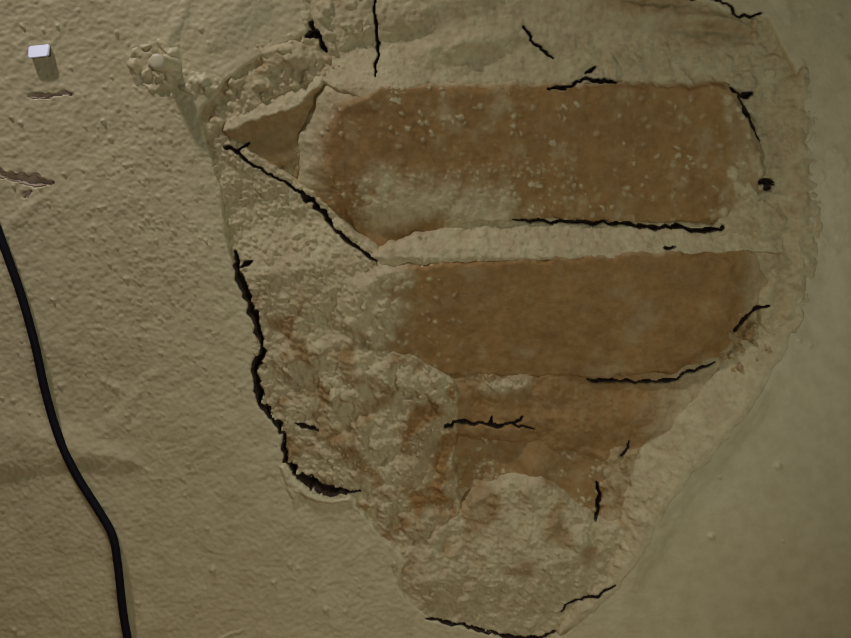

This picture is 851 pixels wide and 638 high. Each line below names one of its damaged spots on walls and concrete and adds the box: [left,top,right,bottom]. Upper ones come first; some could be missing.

crack [714,0,761,19]
crack [372,0,380,77]
crack [522,25,553,59]
crack [547,66,616,90]
crack [223,143,376,261]
crack [512,218,724,250]
spalling [199,0,823,638]
crack [733,305,770,332]
crack [233,250,361,497]
crack [586,361,715,384]
crack [426,584,616,638]